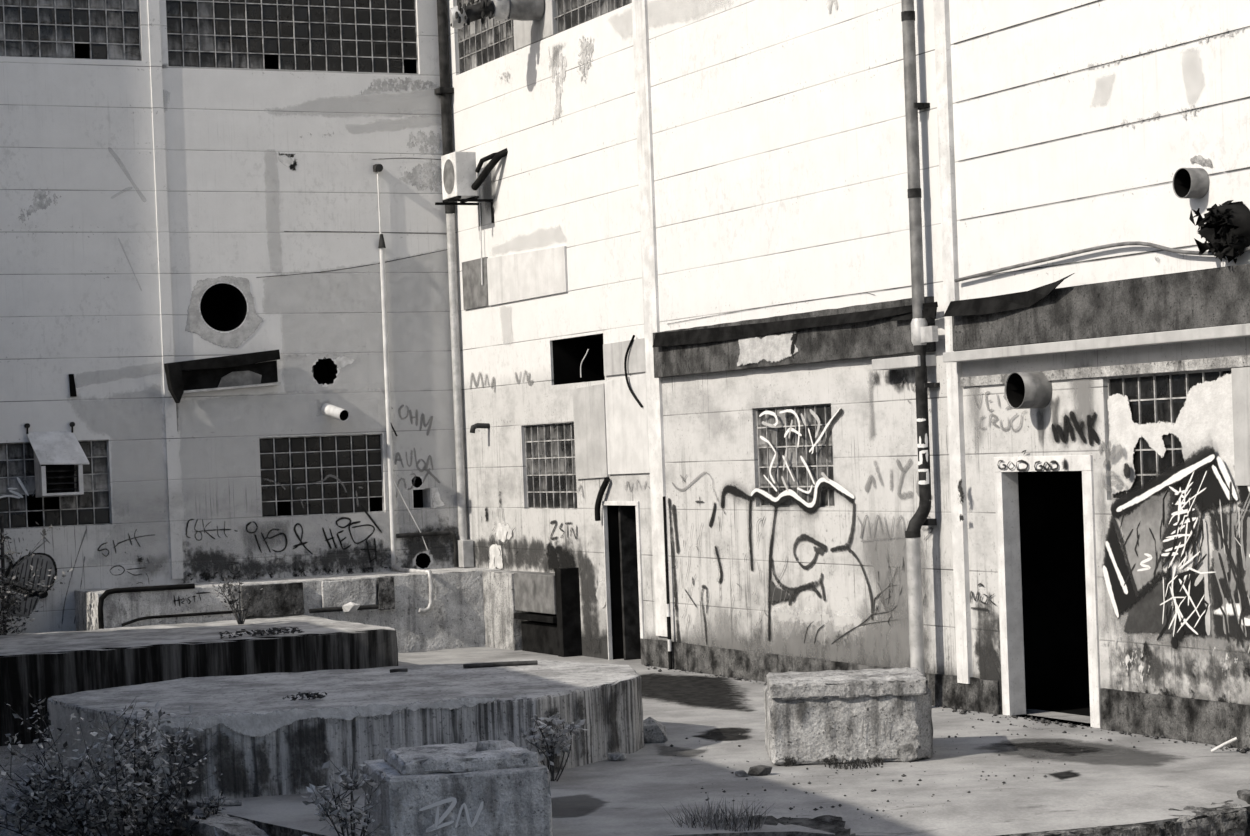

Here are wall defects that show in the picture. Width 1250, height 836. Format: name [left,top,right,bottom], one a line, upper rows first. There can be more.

peeling [18,189,61,223]
spalling [737,331,798,366]
peeling [1107,374,1236,494]
damp [183,520,459,584]
damp [474,536,600,653]
damp [1116,611,1250,704]